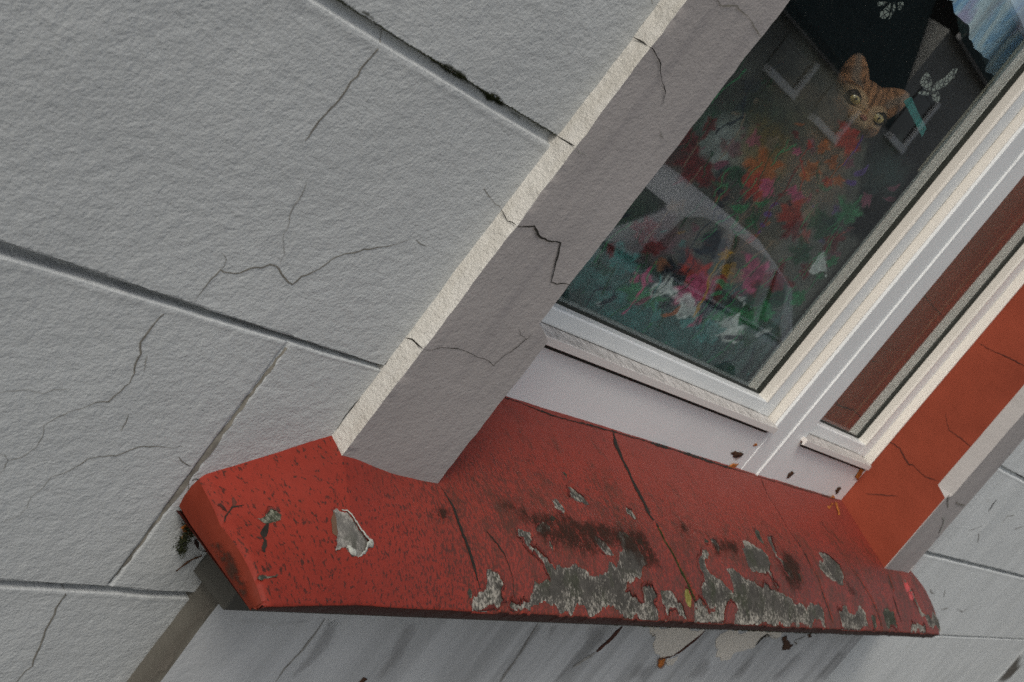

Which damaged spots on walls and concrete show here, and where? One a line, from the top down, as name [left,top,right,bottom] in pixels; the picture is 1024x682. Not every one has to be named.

crack [305,30,382,141]
crack [484,189,570,285]
crack [0,183,427,681]
peeling [258,506,282,524]
peeling [331,508,374,558]
crack [442,489,515,597]
damp [522,509,659,566]
peeling [468,471,825,666]
crack [505,397,837,621]
peeling [819,552,844,586]
peeling [837,605,898,630]
peeling [904,579,941,633]